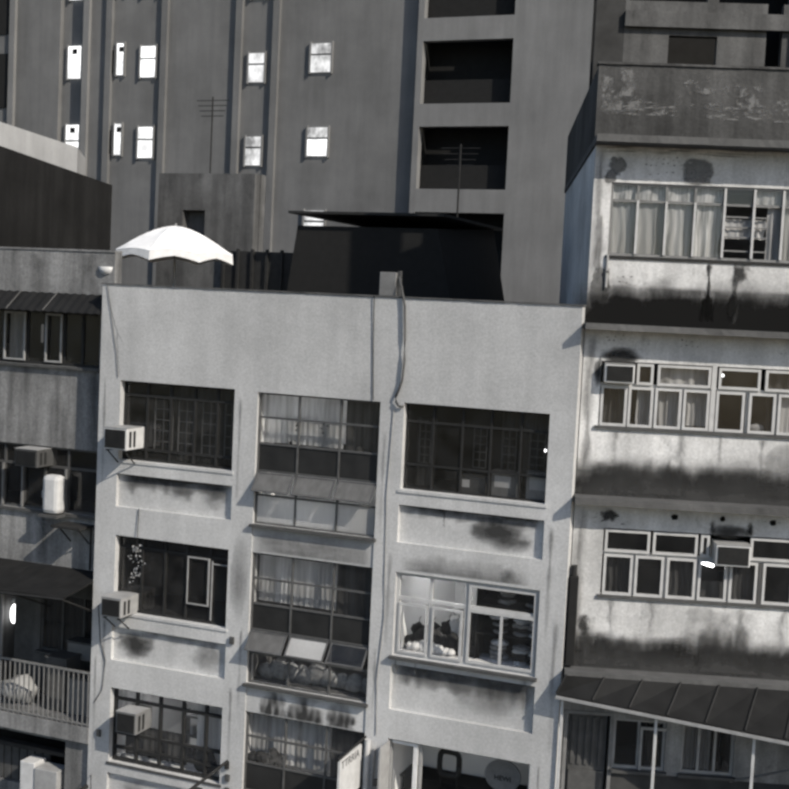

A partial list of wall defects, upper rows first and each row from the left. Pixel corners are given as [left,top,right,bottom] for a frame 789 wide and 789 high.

damp [583,290,789,332]
damp [128,475,226,495]
damp [574,466,789,506]
damp [410,506,536,546]
damp [124,635,150,655]
damp [564,616,789,681]
damp [403,666,528,699]
damp [261,694,355,728]